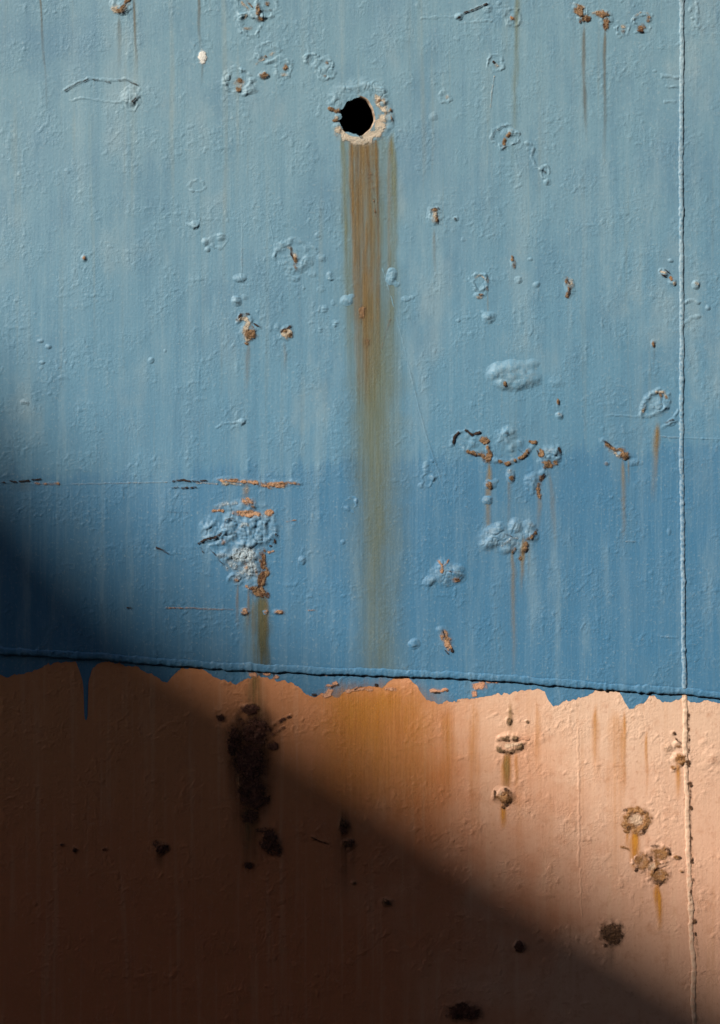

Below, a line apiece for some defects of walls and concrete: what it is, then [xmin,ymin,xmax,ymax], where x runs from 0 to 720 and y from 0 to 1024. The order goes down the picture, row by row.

corrosion [571,1,655,85]
peeling [328,94,396,146]
corrosion [598,436,644,467]
corrosion [481,467,516,505]
spalling [312,674,396,698]
spalling [471,681,498,697]
corrosion [490,785,516,820]
corrosion [621,713,694,917]
corrosion [595,917,627,950]